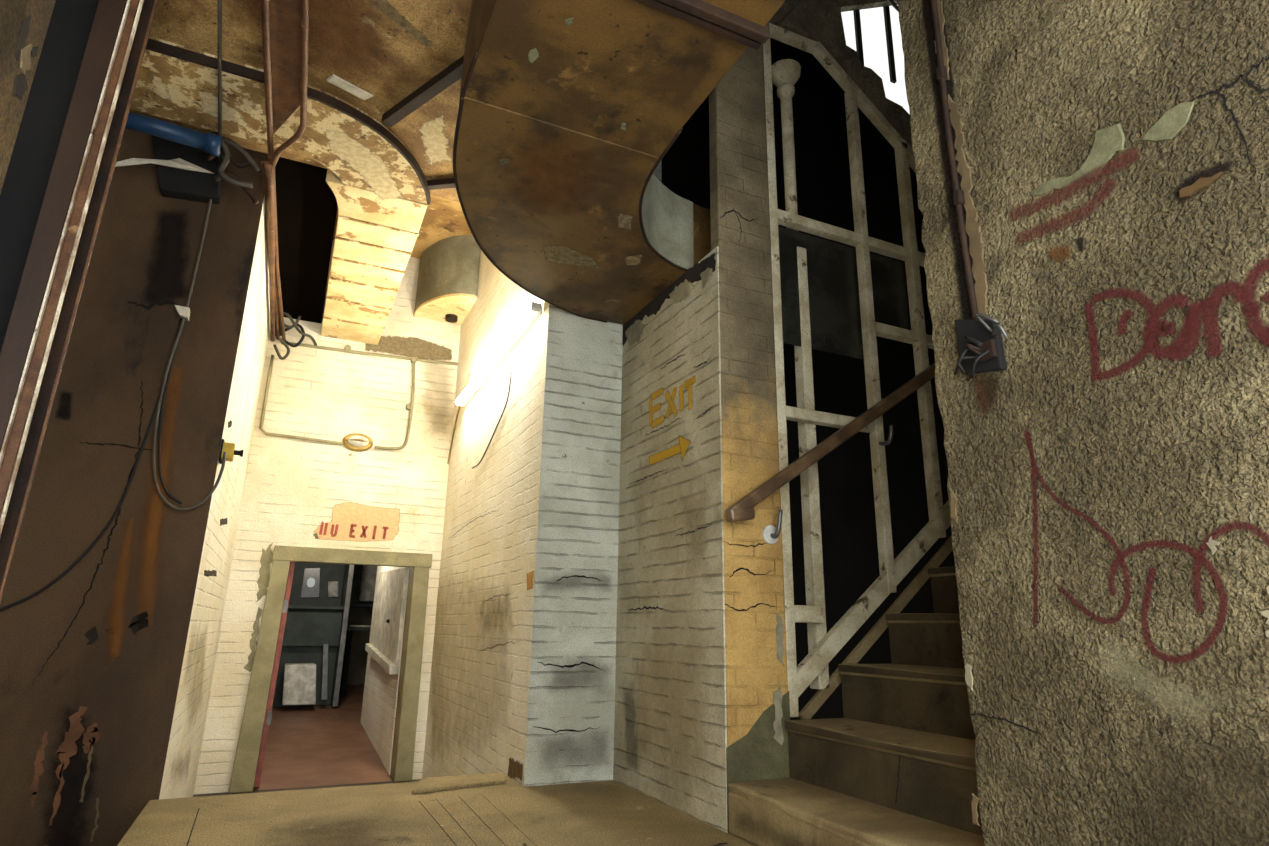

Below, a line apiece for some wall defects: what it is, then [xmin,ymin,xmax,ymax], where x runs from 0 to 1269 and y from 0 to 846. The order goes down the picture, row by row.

peeling [198,91,246,124]
peeling [1143,101,1195,142]
crack [1190,56,1269,173]
peeling [326,130,401,199]
peeling [1028,123,1125,196]
spalling [1206,537,1221,555]
crack [557,574,601,582]
crack [676,524,780,611]
peeling [244,543,273,672]
crack [628,604,669,612]
crack [538,662,603,670]
crack [533,725,601,733]